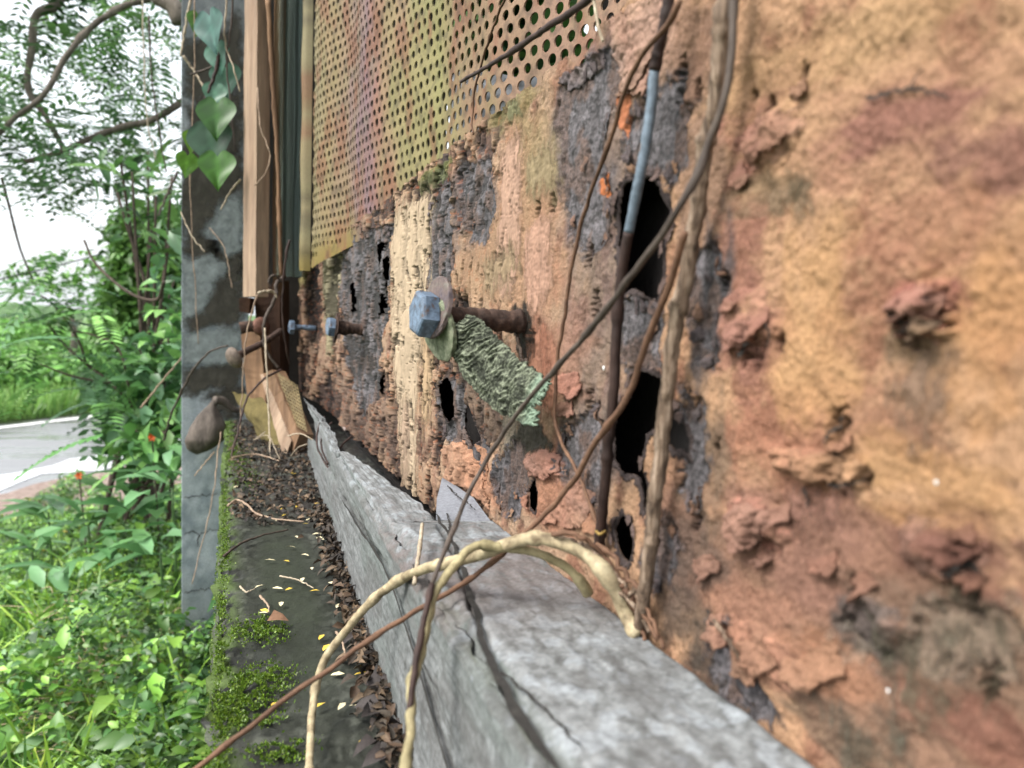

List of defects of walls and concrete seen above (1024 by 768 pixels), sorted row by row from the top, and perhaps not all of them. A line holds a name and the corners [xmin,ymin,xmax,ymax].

spalling [426,155,497,285]
spalling [553,0,701,262]
peeling [725,118,787,191]
spalling [337,223,394,417]
spalling [618,276,668,402]
spalling [685,232,770,370]
spalling [430,371,612,548]
spalling [672,381,714,524]
crack [435,485,583,768]
peeling [625,514,646,569]
peeling [700,570,886,730]
peeling [805,551,838,580]